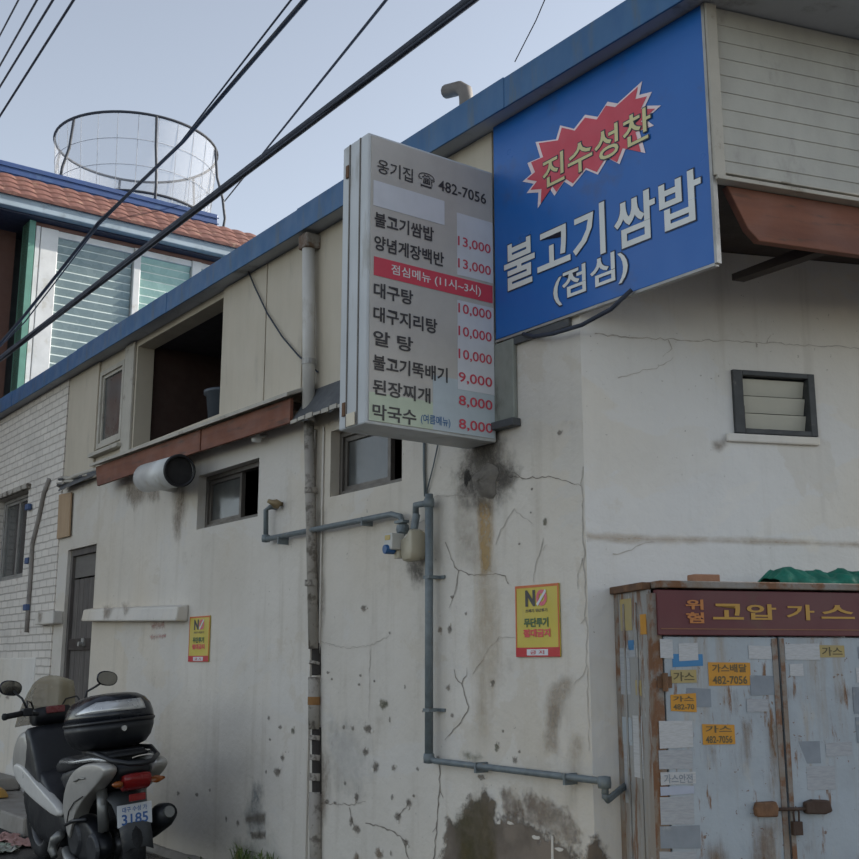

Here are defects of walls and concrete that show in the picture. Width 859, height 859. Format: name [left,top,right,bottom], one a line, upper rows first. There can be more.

rust [479,501,491,570]
crack [445,542,509,607]
crack [504,466,590,746]
crack [446,636,514,738]
crack [321,801,409,859]
crack [433,765,443,859]
damp [502,790,576,841]